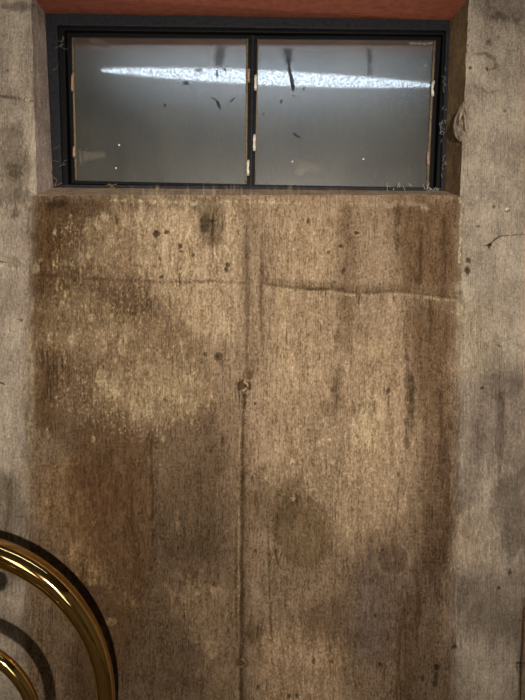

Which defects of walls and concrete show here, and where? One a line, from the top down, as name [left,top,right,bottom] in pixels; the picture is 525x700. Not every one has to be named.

leakage [28,195,458,700]